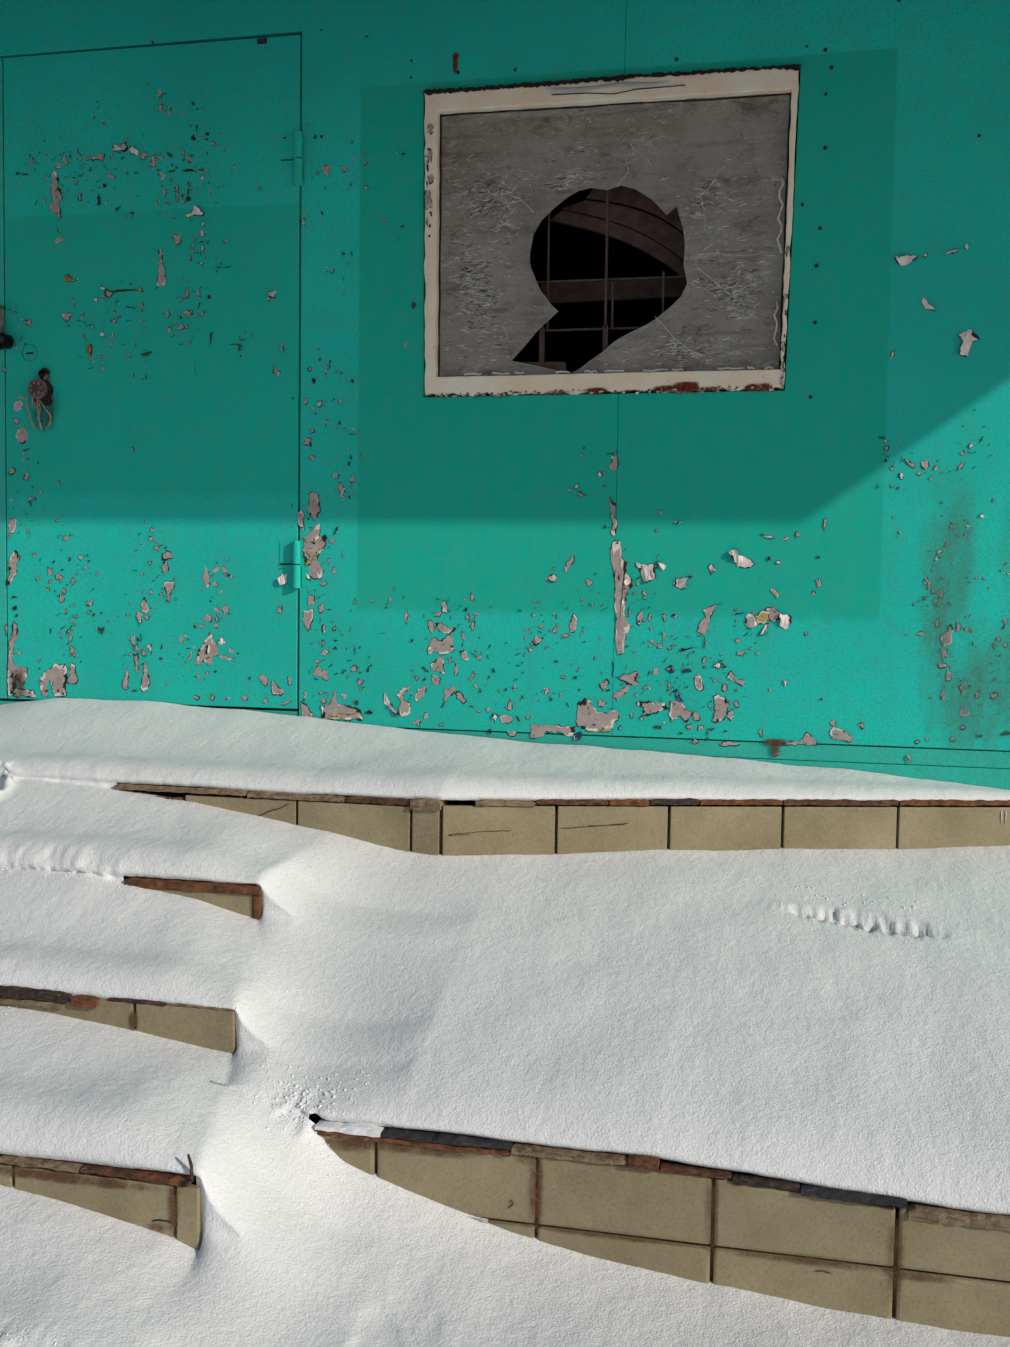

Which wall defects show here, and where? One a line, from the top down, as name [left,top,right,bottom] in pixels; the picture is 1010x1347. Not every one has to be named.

peeling [15,83,236,385]
peeling [895,244,969,266]
peeling [958,328,980,357]
corrosion [653,382,721,393]
corrosion [746,383,771,391]
peeling [5,348,794,747]
peeling [905,499,1009,742]
peeling [772,720,865,757]